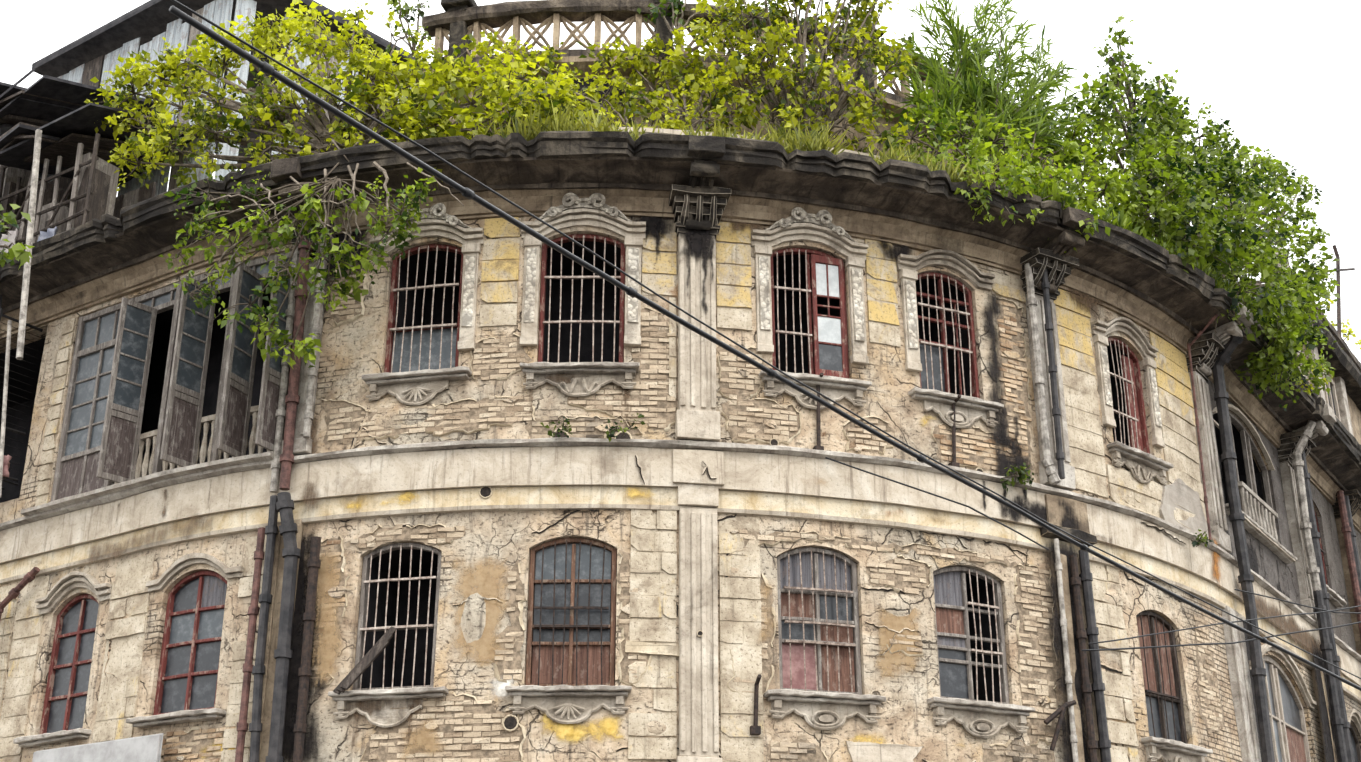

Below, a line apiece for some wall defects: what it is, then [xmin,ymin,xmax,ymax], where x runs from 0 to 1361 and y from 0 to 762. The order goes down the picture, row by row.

crack [1124,571,1195,602]
spalling [718,565,776,697]
spalling [730,528,1059,762]
spalling [359,692,526,762]
peeling [543,716,621,741]